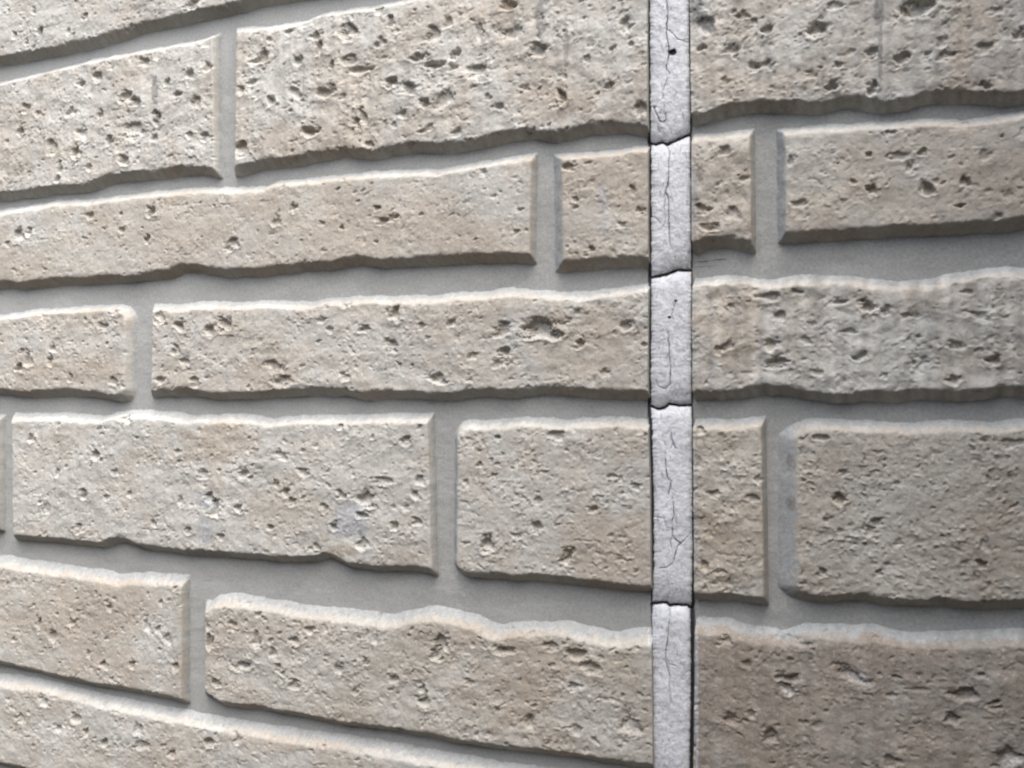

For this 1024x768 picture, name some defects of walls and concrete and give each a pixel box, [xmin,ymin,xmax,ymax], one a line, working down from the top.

crack [648,0,695,768]